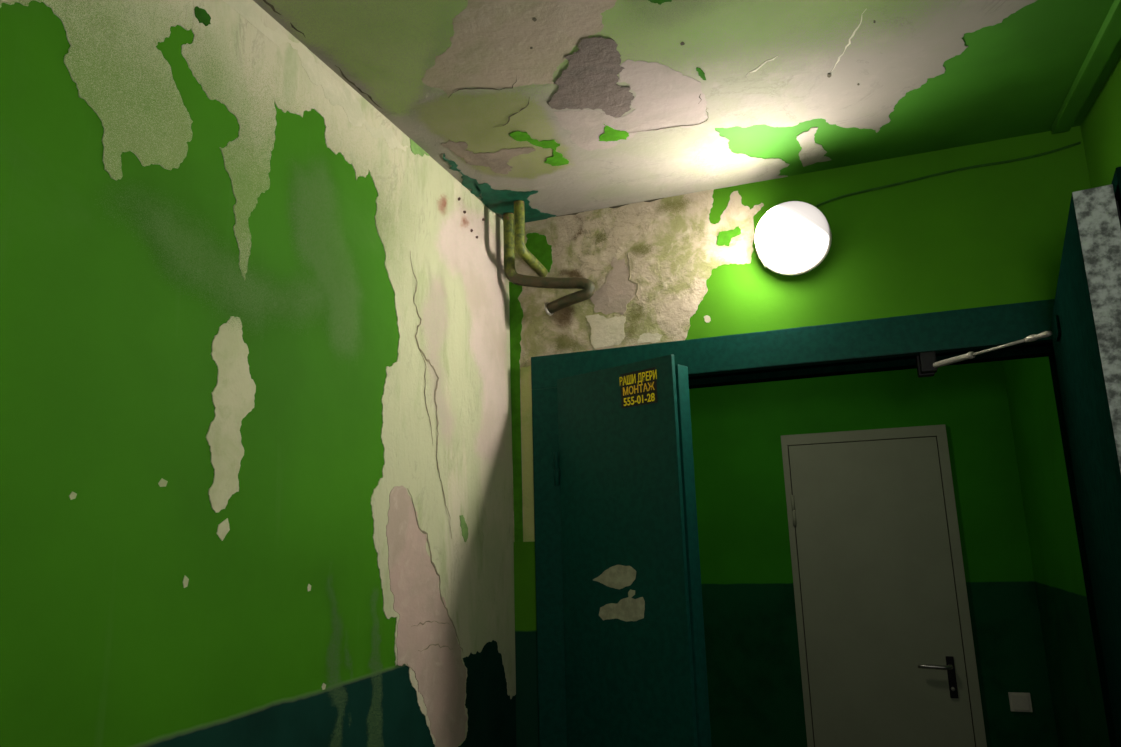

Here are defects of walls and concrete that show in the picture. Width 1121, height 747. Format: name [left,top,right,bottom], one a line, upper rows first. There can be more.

peeling [0,0,32,8]
peeling [253,0,1037,217]
peeling [35,0,764,747]
crack [407,251,463,651]